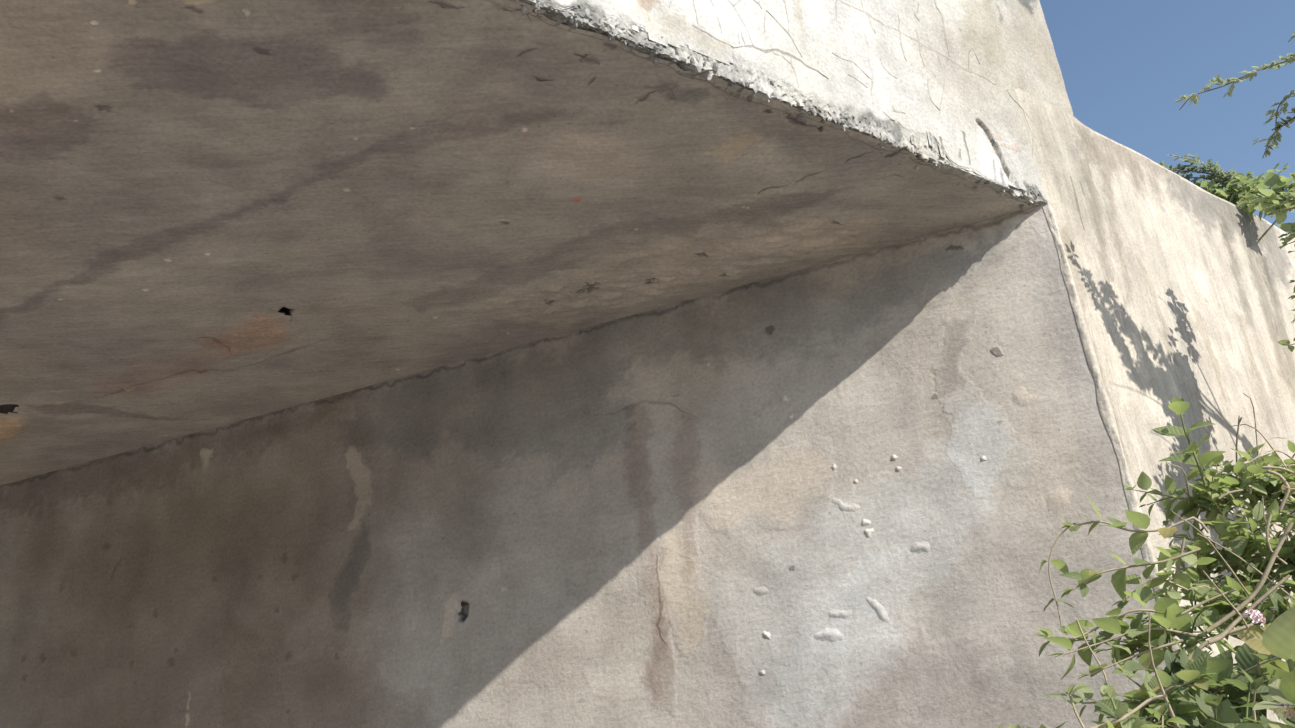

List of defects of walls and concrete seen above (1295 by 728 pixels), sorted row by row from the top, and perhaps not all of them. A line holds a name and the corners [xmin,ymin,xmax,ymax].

damp [0,88,112,171]
damp [97,0,435,114]
damp [0,104,592,325]
crack [0,0,1085,488]
spalling [468,0,1165,601]
damp [1017,0,1040,17]
spalling [0,406,69,442]
damp [185,207,1040,728]